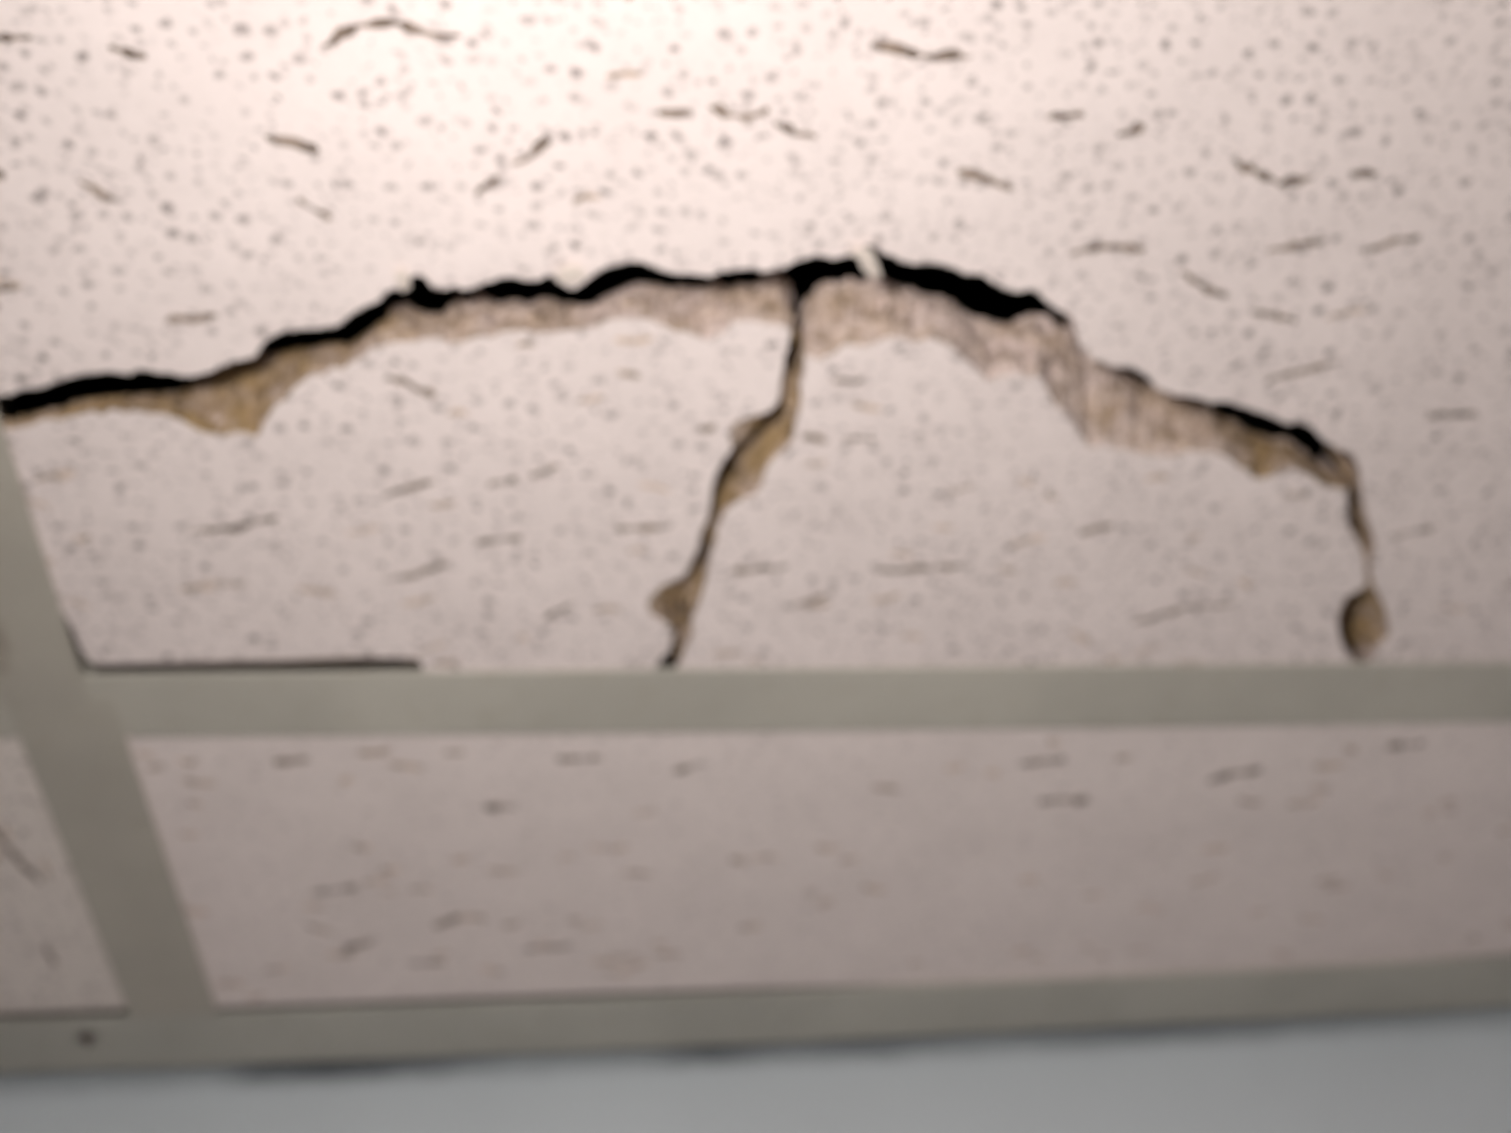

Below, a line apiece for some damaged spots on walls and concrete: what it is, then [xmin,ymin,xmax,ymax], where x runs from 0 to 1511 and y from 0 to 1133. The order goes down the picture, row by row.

crack [1,247,1377,592]
crack [664,608,693,664]